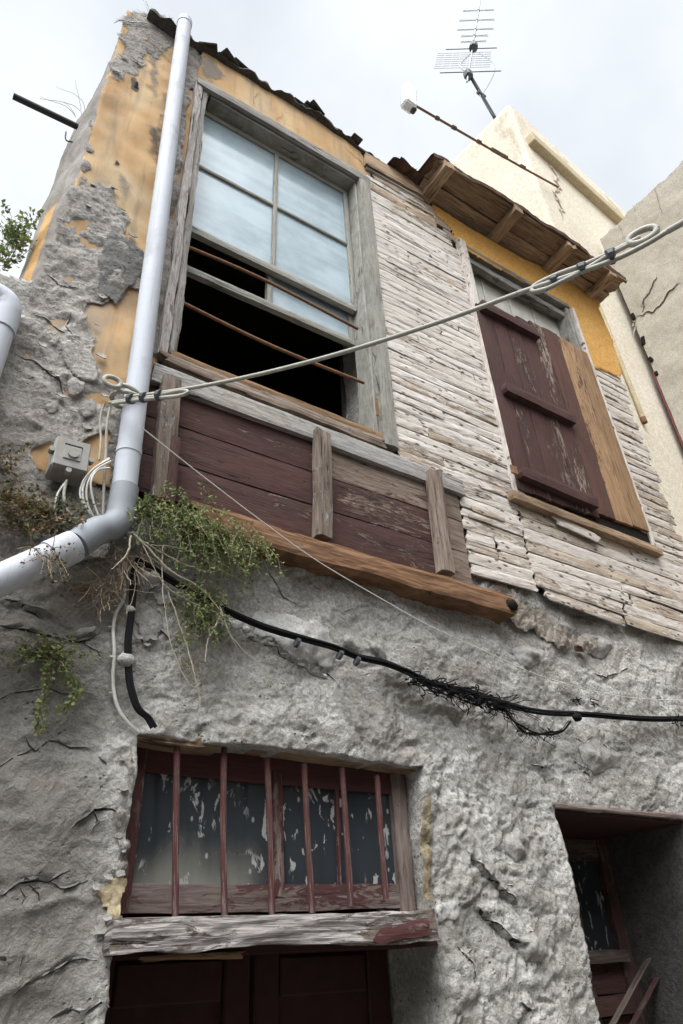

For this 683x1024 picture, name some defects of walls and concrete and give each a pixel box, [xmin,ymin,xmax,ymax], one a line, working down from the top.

flaking render [108,11,175,91]
crack [632,275,682,336]
flaking render [0,142,145,562]
flaking render [486,581,598,658]
crack [70,804,117,832]
flaking render [92,748,135,940]
crack [0,870,88,905]
crack [466,850,526,946]